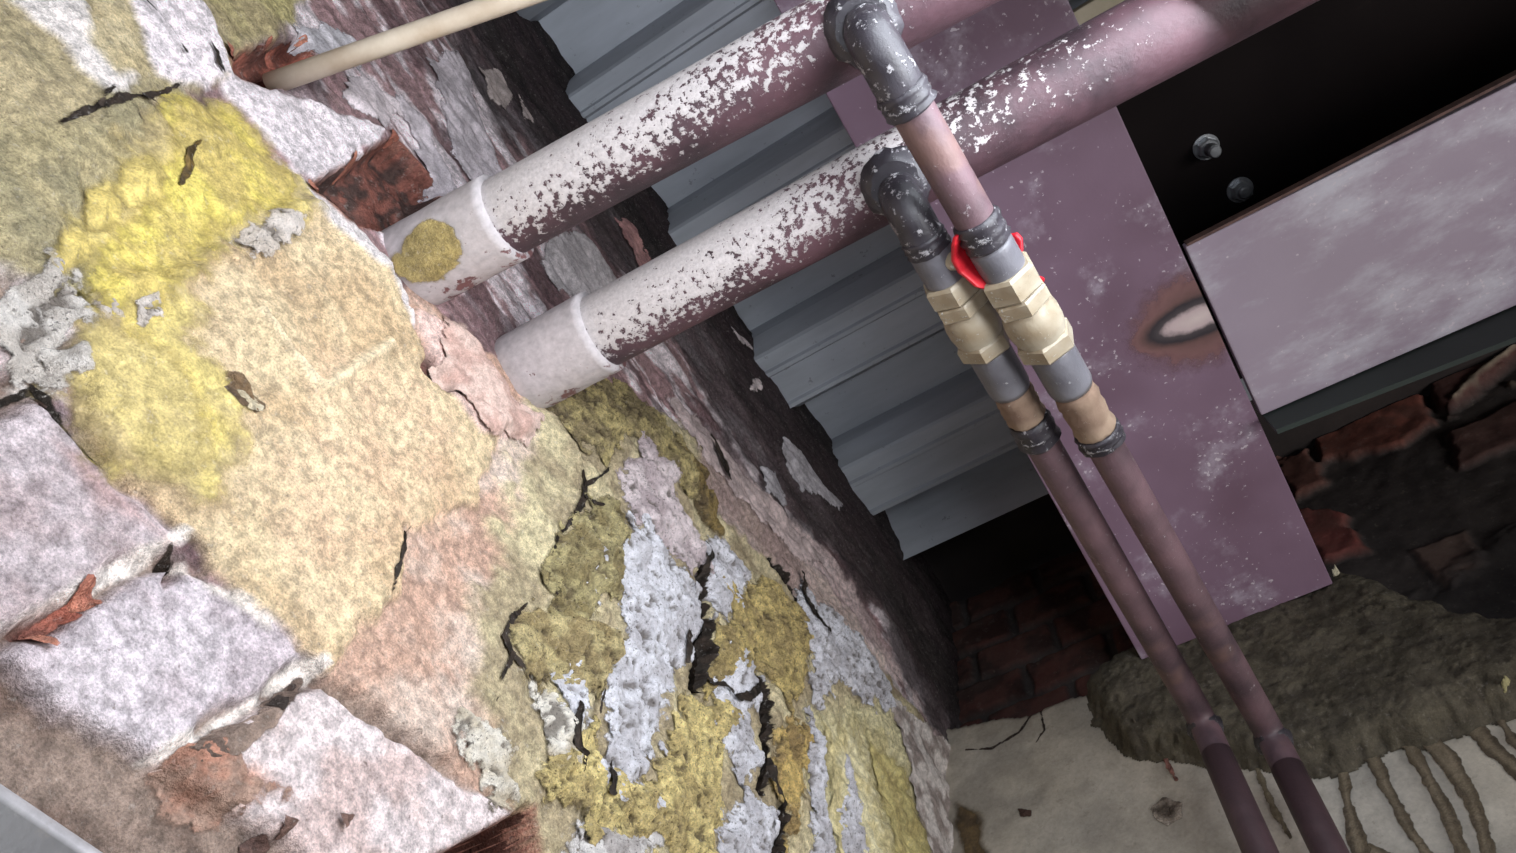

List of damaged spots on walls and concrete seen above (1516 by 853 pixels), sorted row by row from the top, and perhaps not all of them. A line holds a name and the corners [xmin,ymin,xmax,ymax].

peeling [308,50,534,232]
crack [552,467,609,553]
peeling [670,397,843,563]
spalling [147,677,304,853]
spalling [443,813,524,853]
crack [496,590,559,701]
crack [574,688,618,795]
crack [686,539,792,853]
rust [955,806,987,853]
water stain [1337,772,1371,853]
water stain [1363,755,1433,853]
water stain [1401,739,1496,853]